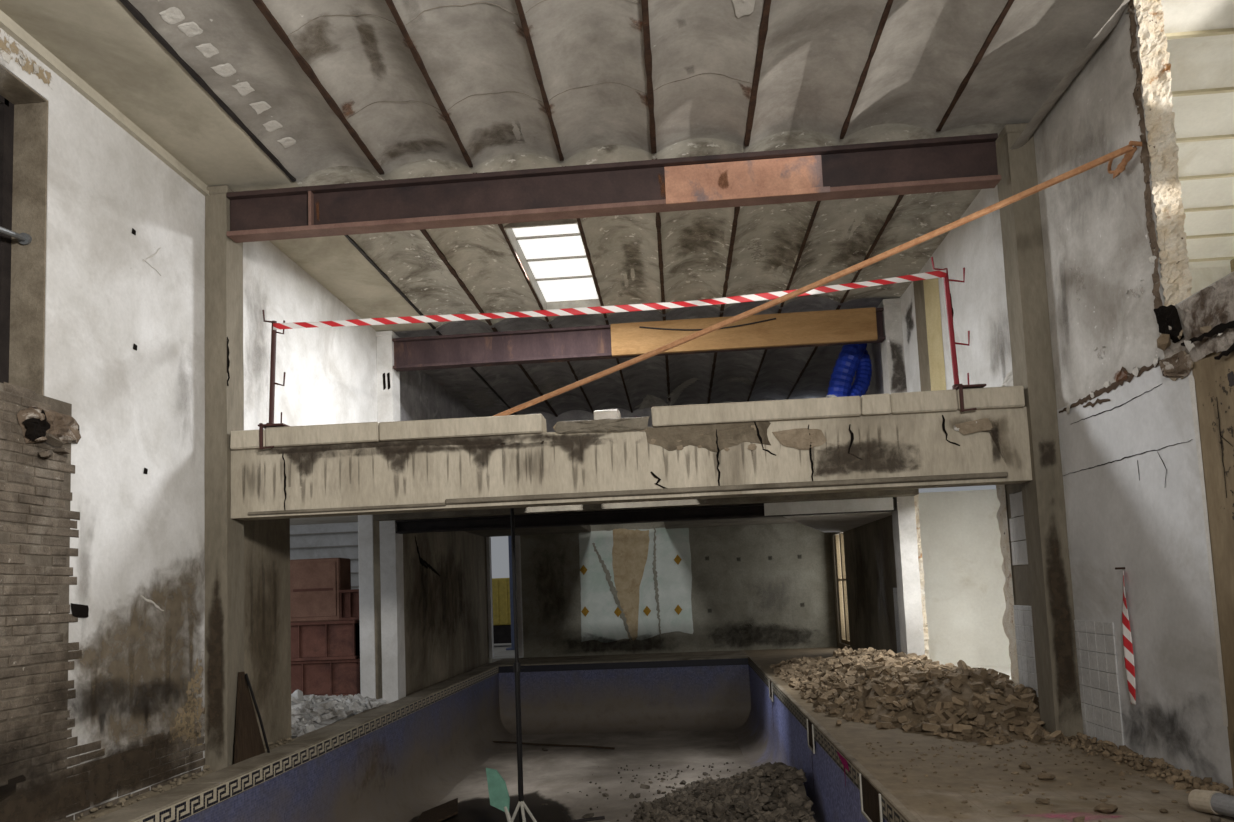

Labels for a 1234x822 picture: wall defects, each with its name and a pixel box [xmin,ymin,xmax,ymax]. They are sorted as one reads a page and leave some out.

peeling [0,32,51,84]
spalling [1126,0,1234,381]
damp [271,434,602,474]
crack [714,429,722,486]
crack [754,422,776,456]
crack [807,425,815,481]
crack [847,424,855,453]
damp [816,441,917,475]
flaking render [0,382,107,802]
damp [0,562,224,822]